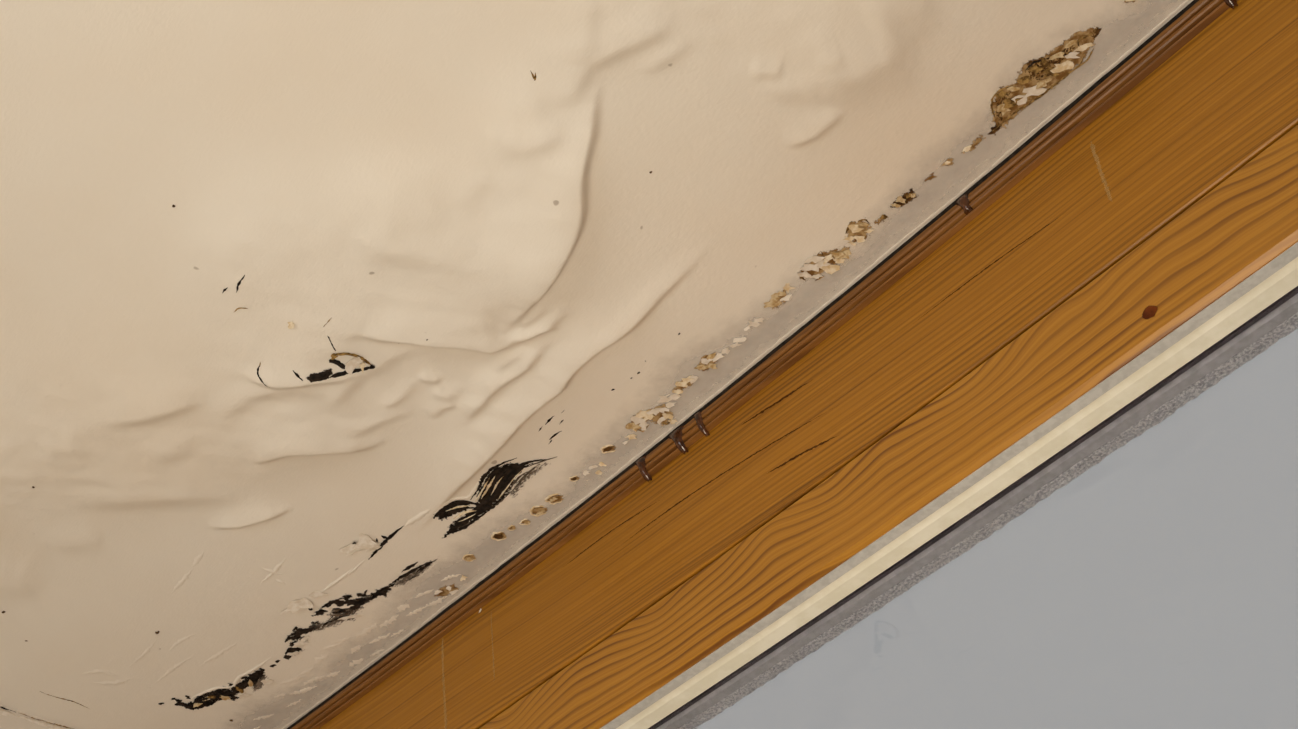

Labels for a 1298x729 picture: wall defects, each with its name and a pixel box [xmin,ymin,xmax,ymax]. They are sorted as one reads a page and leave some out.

damp [897,21,1134,226]
flaking render [569,27,1101,482]
peeling [339,416,564,560]
damp [389,516,541,634]